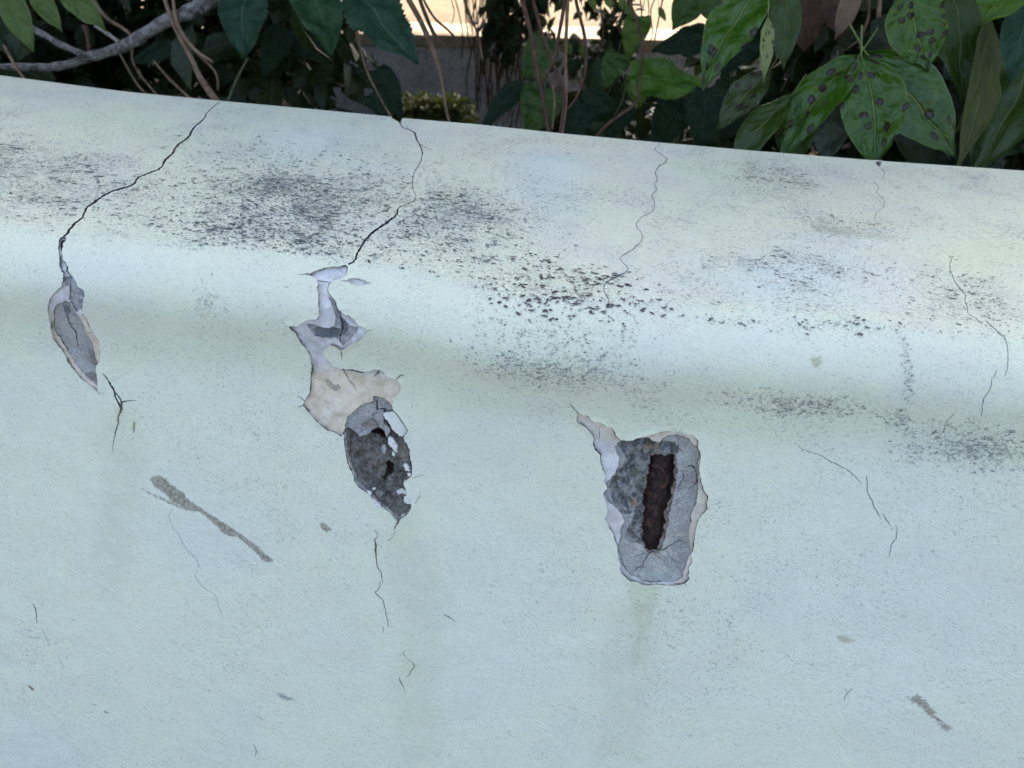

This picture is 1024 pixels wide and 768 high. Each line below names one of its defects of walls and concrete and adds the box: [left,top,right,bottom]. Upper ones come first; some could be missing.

peeling [42,237,104,396]
crack [103,374,136,450]
crack [63,102,219,237]
peeling [283,265,417,521]
crack [348,122,433,265]
water stain [0,123,1024,479]
crack [603,141,668,307]
crack [948,255,1009,416]
crack [374,521,399,632]
spalling [570,404,713,590]
crack [799,446,897,557]